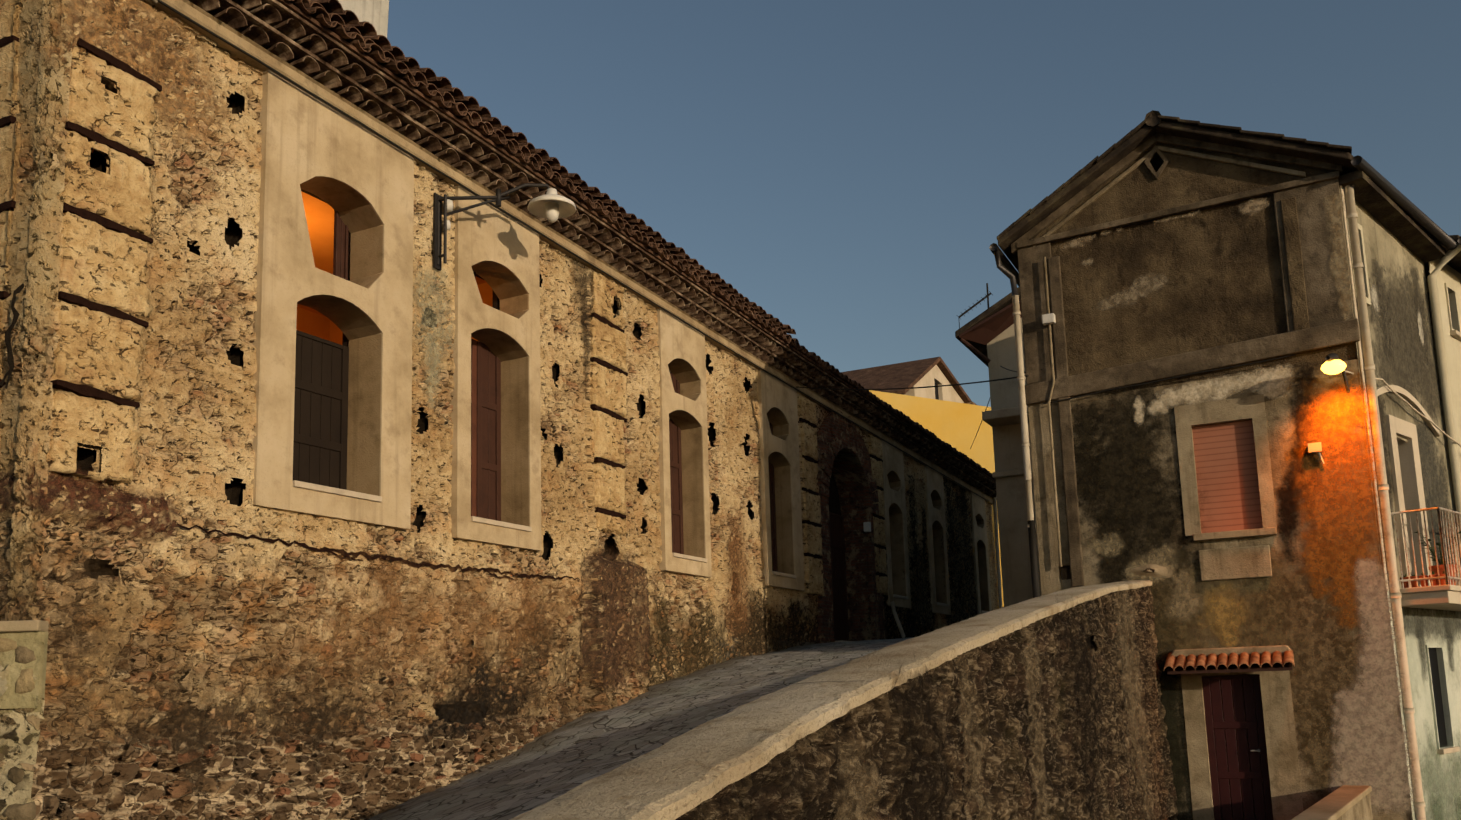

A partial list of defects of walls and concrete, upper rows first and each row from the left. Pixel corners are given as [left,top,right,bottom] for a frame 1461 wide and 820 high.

crack [0,284,24,389]
peeling [1134,367,1294,423]
crack [177,524,580,580]
damp [1062,362,1366,820]